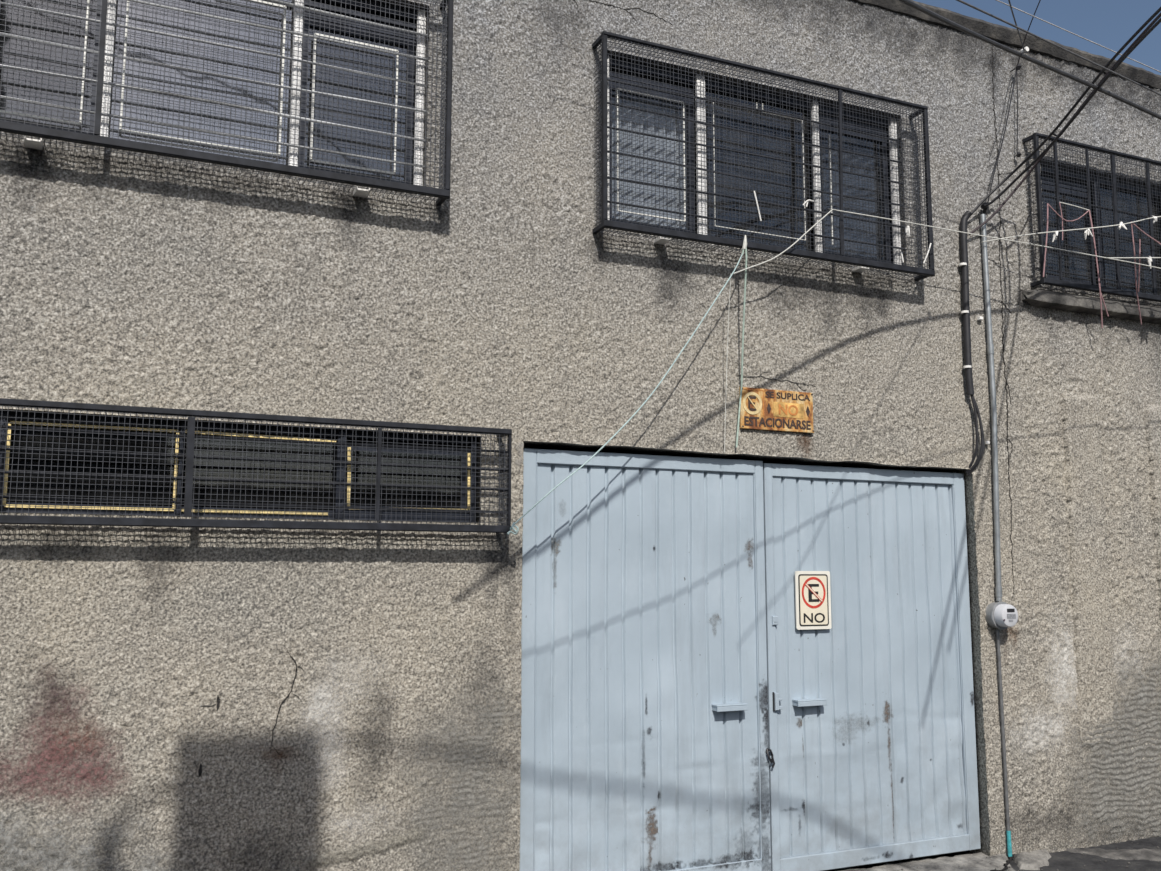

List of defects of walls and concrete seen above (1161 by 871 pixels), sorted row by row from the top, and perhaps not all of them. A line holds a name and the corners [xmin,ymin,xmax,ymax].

crack [574,0,671,24]
crack [992,45,1015,594]
crack [270,650,304,758]
rust [648,808,658,861]